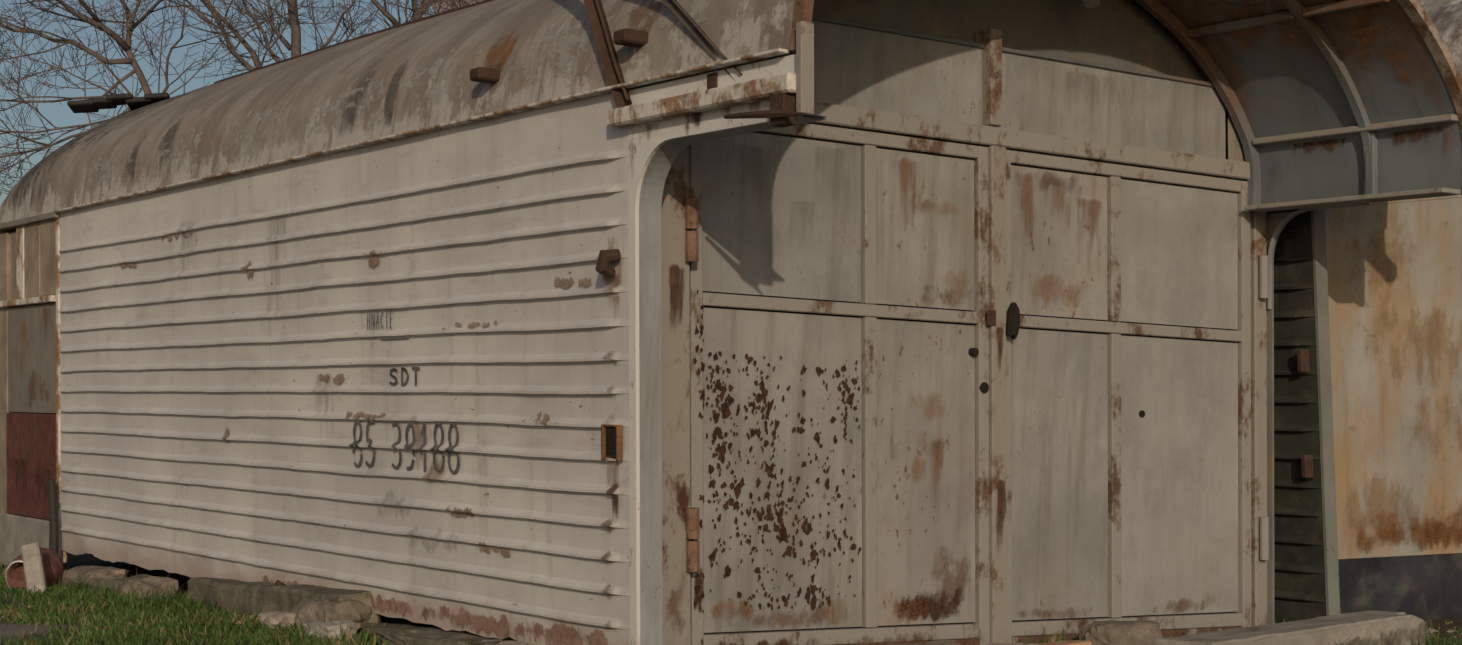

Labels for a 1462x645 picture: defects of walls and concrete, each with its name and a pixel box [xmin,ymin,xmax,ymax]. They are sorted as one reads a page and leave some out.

corrosion [789,0,814,53]
leakage [345,75,373,127]
leakage [385,64,407,122]
corrosion [1394,0,1462,142]
leakage [7,83,214,206]
corrosion [1293,138,1345,150]
corrosion [997,480,1006,536]
corrosion [1359,514,1462,549]
corrosion [670,571,825,645]
corrosion [896,562,967,621]